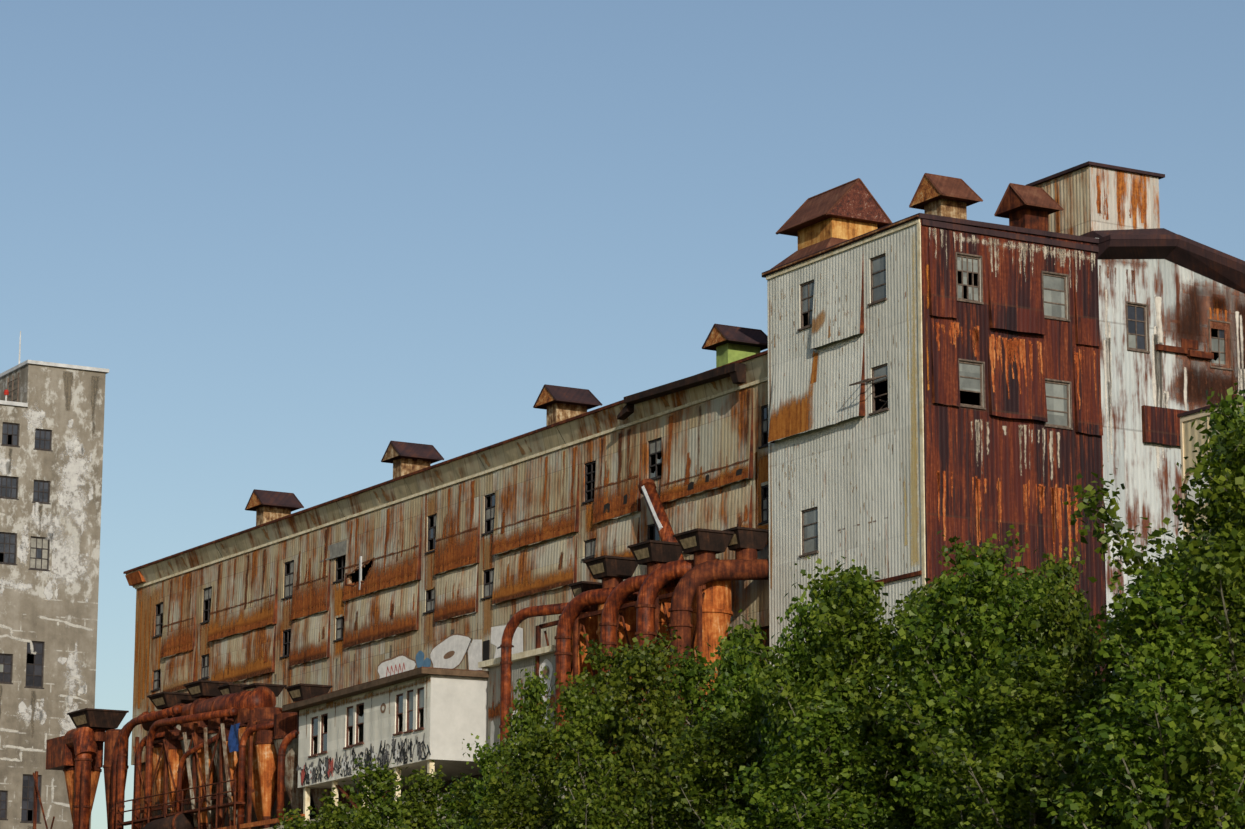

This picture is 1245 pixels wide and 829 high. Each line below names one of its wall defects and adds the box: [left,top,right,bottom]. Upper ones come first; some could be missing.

rust [1097,176,1144,223]
damp [63,371,73,410]
damp [91,376,99,434]
rust [927,322,1043,397]
rust [1074,349,1096,409]
damp [1103,289,1113,461]
damp [1152,296,1169,408]
damp [1235,311,1245,418]
rust [133,407,639,709]
rust [660,351,818,589]
rust [936,471,953,541]
rust [971,420,1078,563]